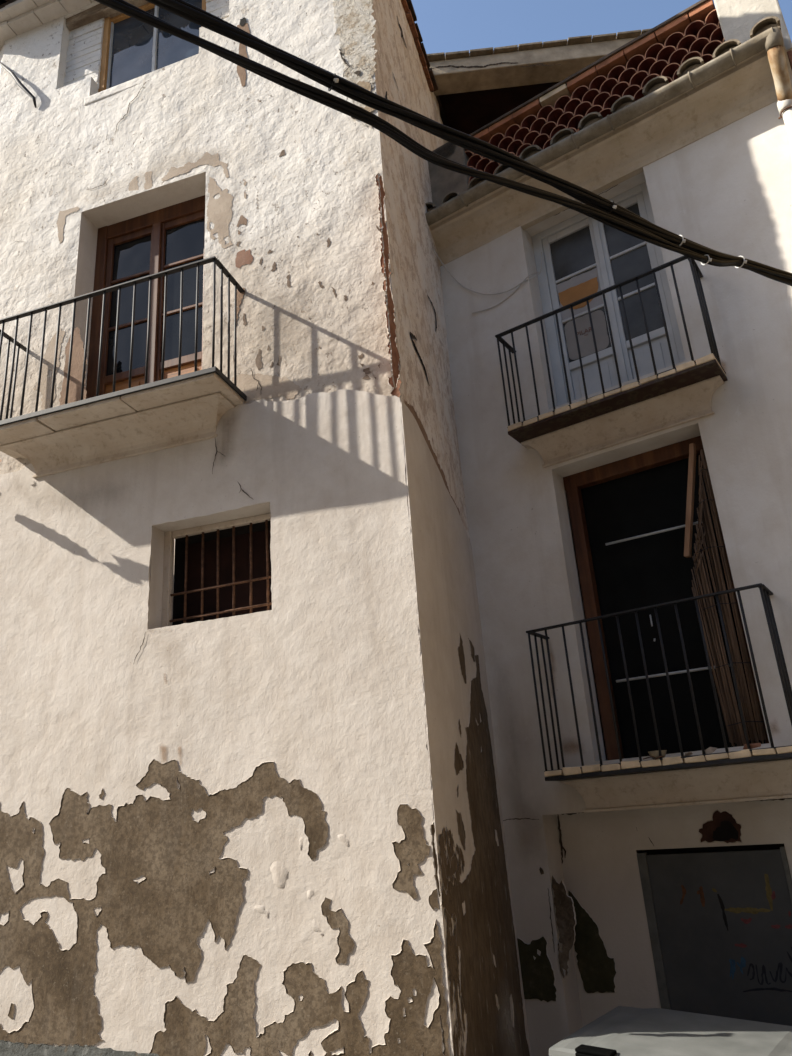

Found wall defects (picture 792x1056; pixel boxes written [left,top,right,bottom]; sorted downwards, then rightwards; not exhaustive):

spalling [333,0,377,93]
spalling [351,99,375,128]
flaking render [56,207,79,243]
flaking render [128,152,276,272]
crack [410,297,437,386]
peeling [150,633,530,1056]
spalling [698,810,743,844]
peeling [0,759,328,1047]
peeling [539,867,576,980]